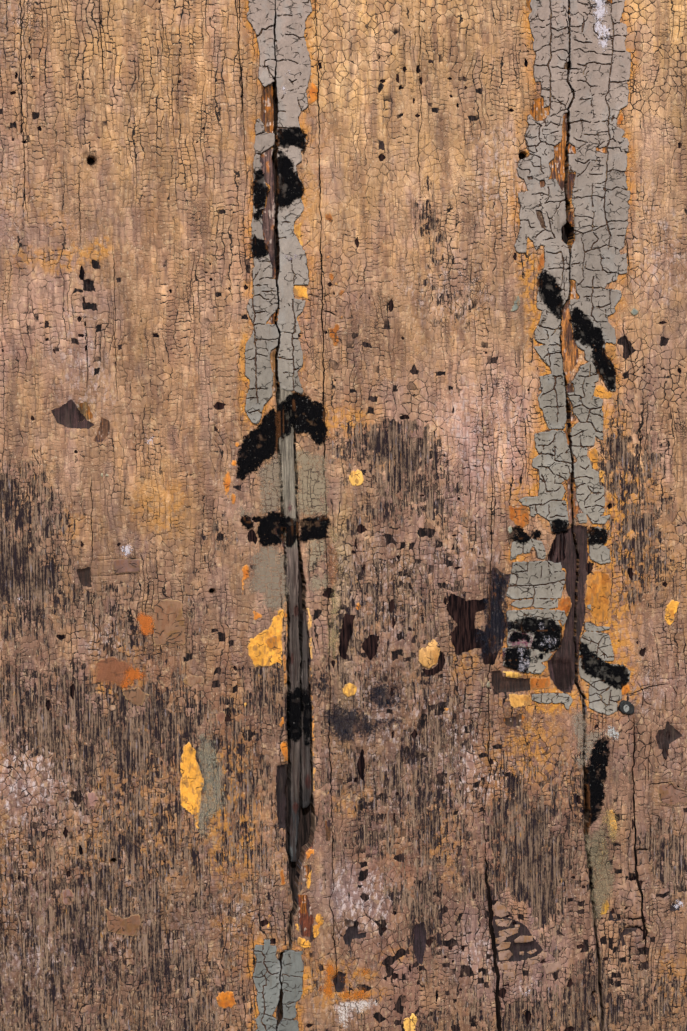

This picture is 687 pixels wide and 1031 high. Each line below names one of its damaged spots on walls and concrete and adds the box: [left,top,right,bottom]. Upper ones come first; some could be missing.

peeling [239,0,322,424]
peeling [422,0,632,767]
peeling [253,842,324,1031]